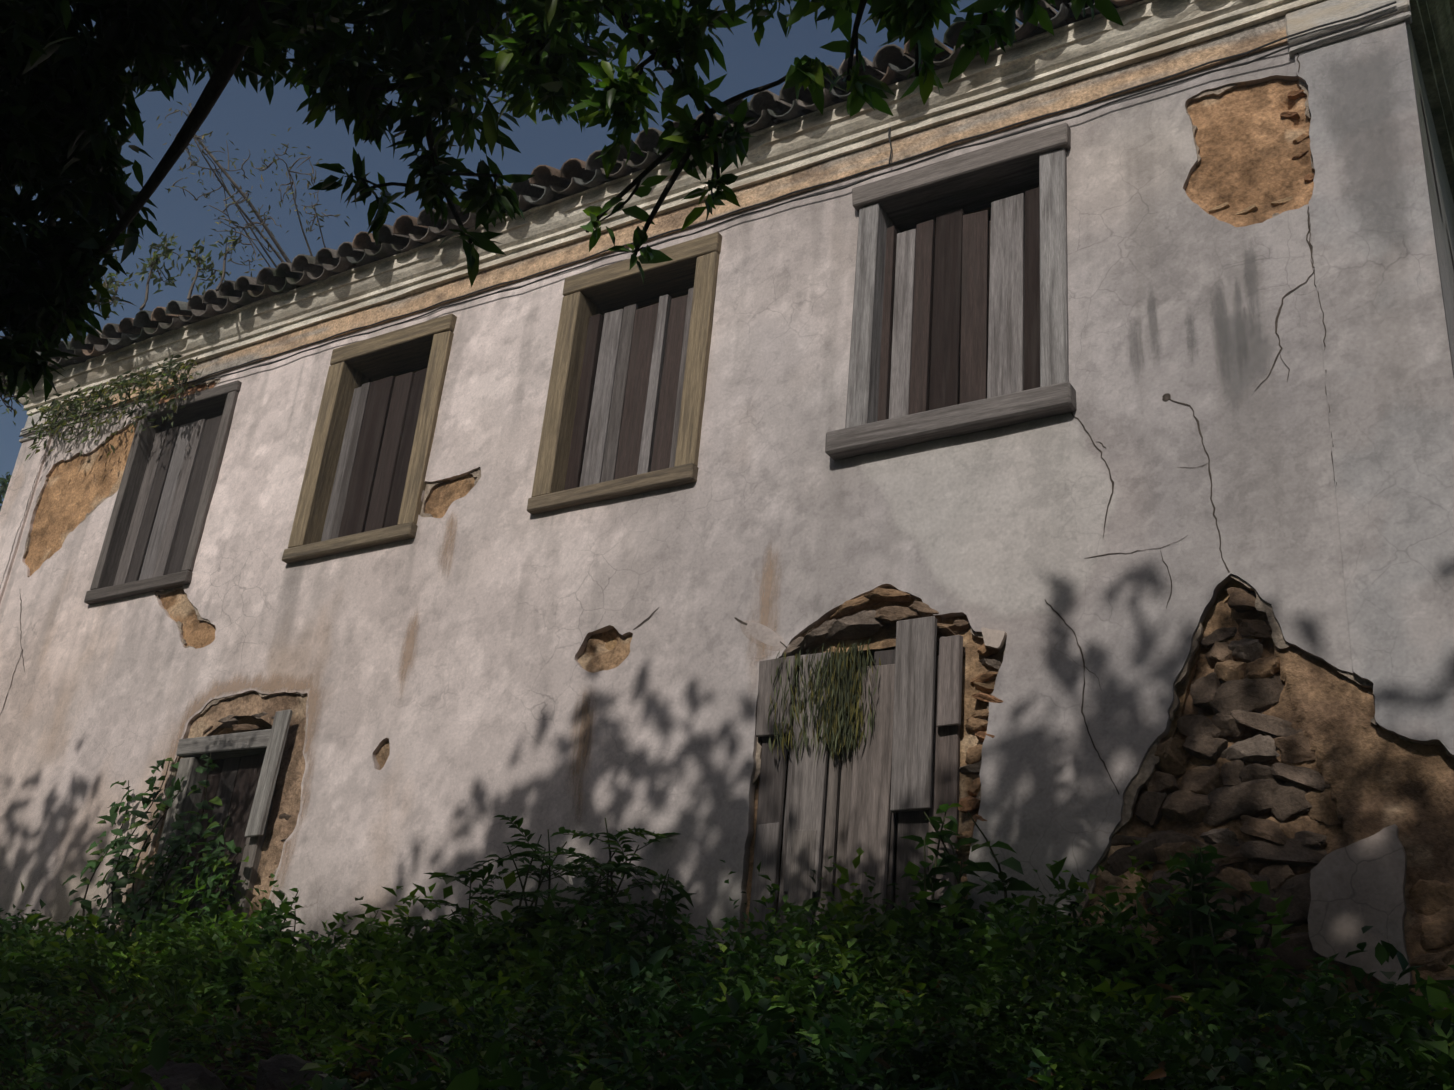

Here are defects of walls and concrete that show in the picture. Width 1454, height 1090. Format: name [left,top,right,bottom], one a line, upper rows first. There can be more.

spalling [1185,79,1315,227]
crack [1256,206,1337,486]
spalling [23,418,138,577]
spalling [420,468,481,518]
crack [1071,399,1230,608]
spalling [155,587,216,649]
spalling [188,691,308,930]
spalling [376,740,390,769]
spalling [578,628,633,673]
spalling [782,585,1007,900]
crack [1045,599,1119,795]
spalling [1068,575,1454,1027]